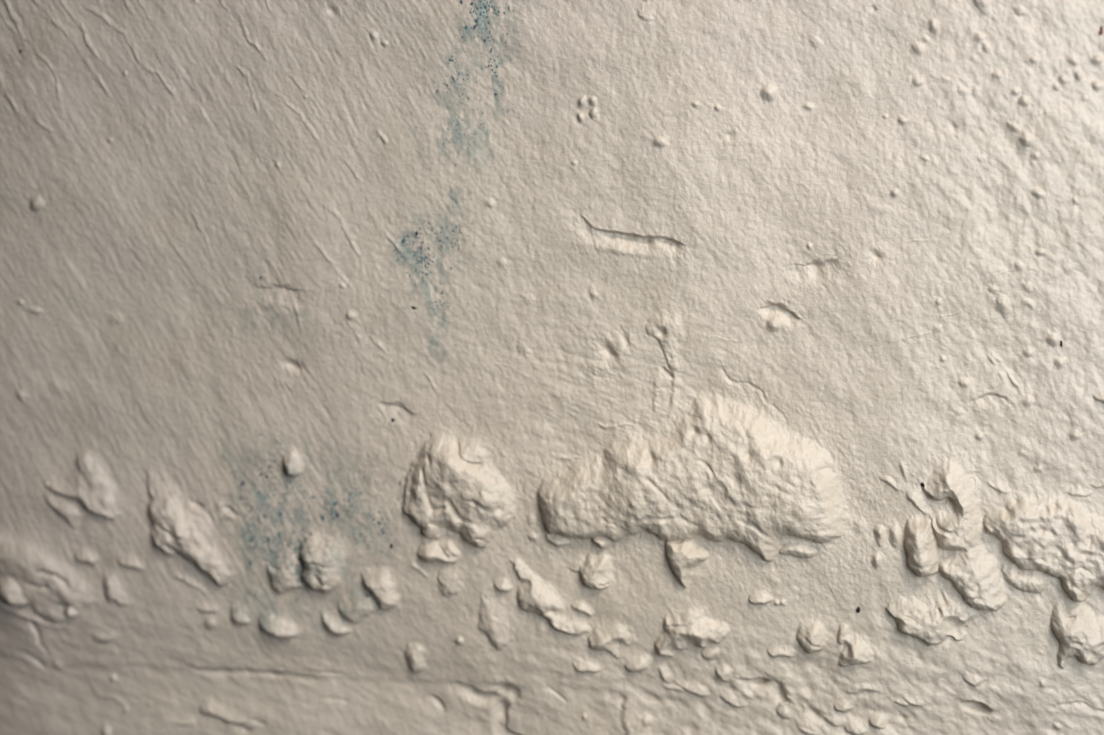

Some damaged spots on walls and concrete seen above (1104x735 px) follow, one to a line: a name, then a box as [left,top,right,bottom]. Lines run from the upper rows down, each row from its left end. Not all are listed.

damp [436,0,514,105]
damp [395,222,469,321]